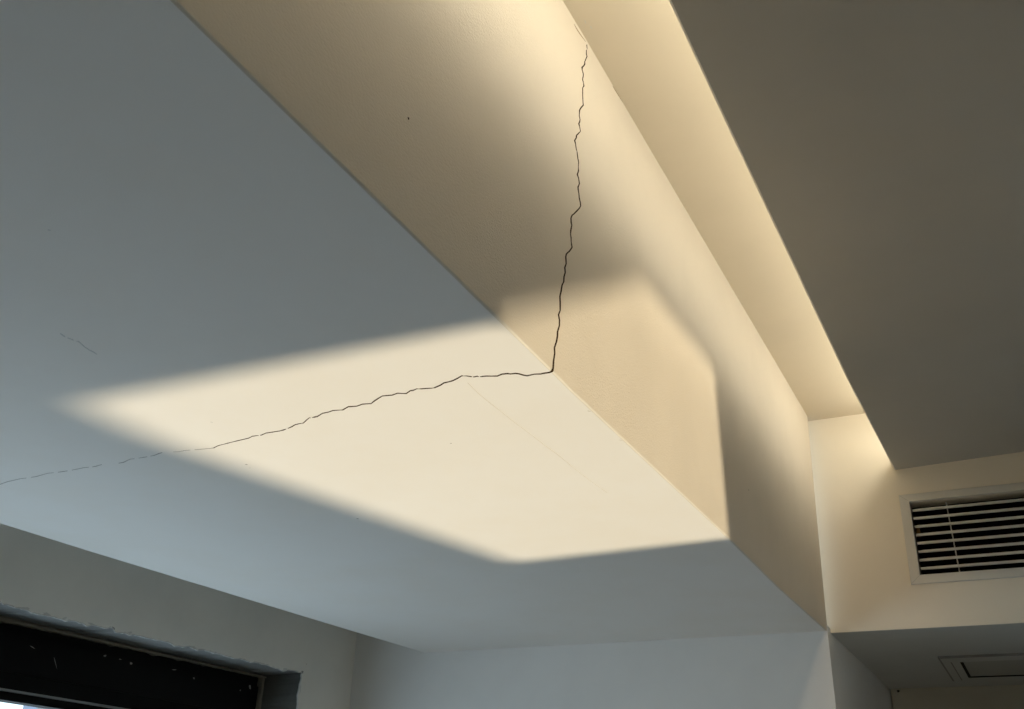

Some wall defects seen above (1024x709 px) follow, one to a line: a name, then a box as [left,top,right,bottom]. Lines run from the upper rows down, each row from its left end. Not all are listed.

crack [1,45,607,493]